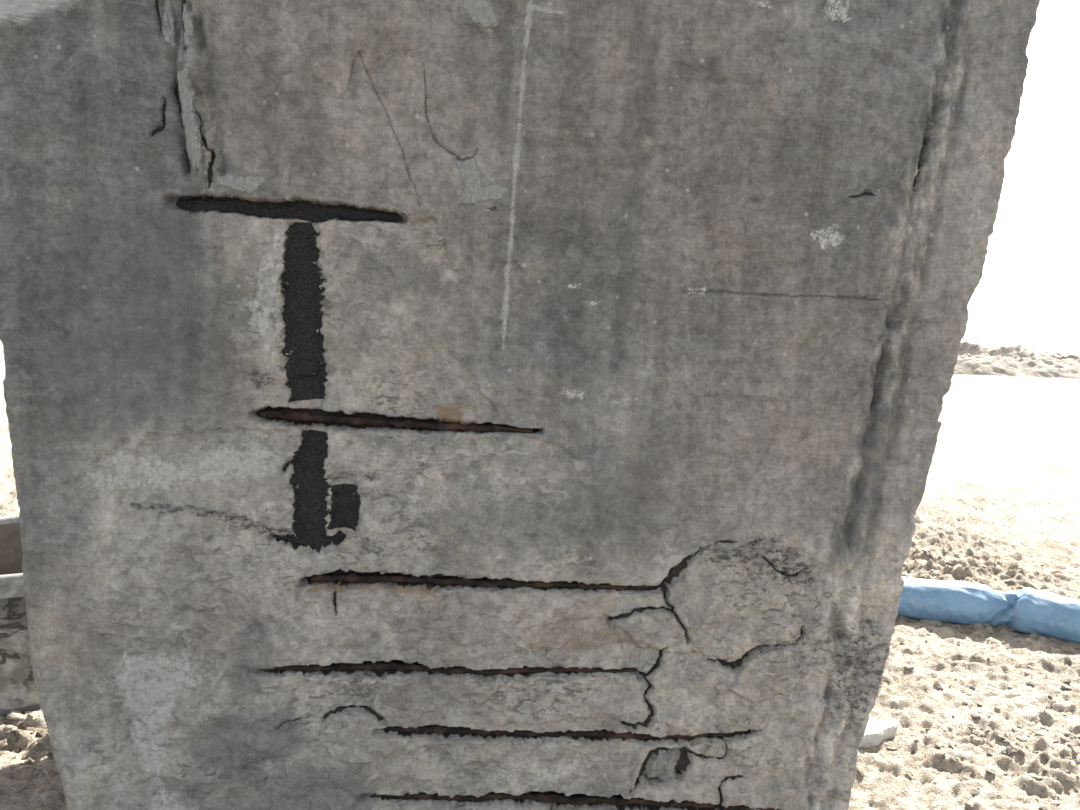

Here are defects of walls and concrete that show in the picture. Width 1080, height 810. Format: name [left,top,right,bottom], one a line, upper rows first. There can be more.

crack [155,0,186,49]
crack [151,81,215,187]
peeling [177,68,202,171]
spalling [176,174,403,222]
crack [608,540,806,638]
crack [708,628,802,670]
crack [278,705,384,727]
crack [621,649,663,729]
crack [685,743,743,805]